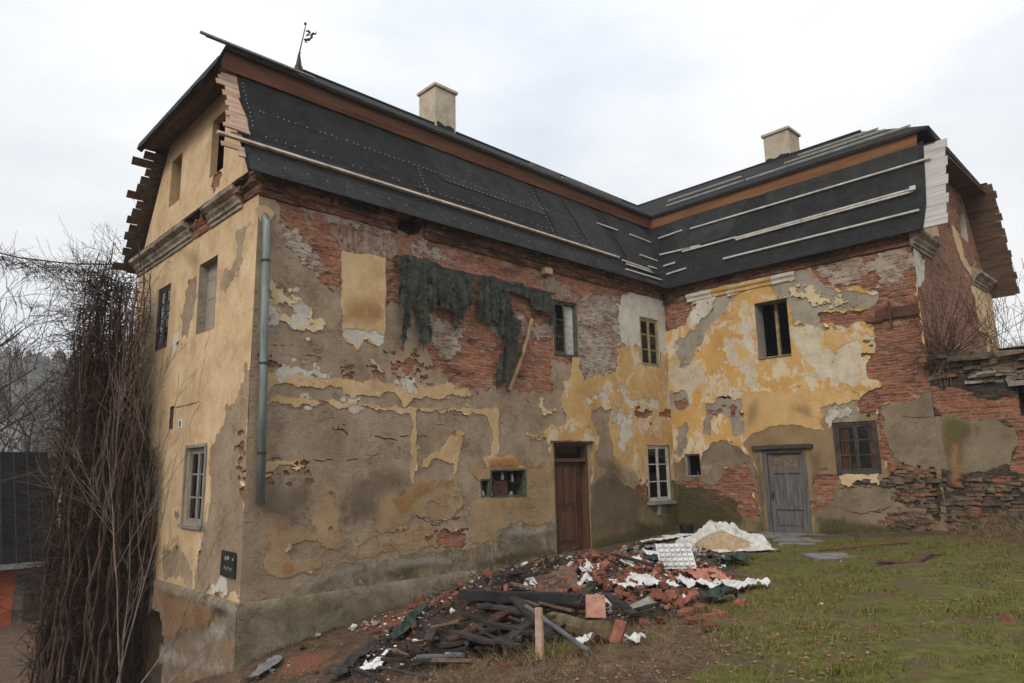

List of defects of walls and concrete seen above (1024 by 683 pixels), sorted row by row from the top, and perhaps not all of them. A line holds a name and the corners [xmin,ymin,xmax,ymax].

flaking render [212,172,222,193]
flaking render [162,201,1024,602]